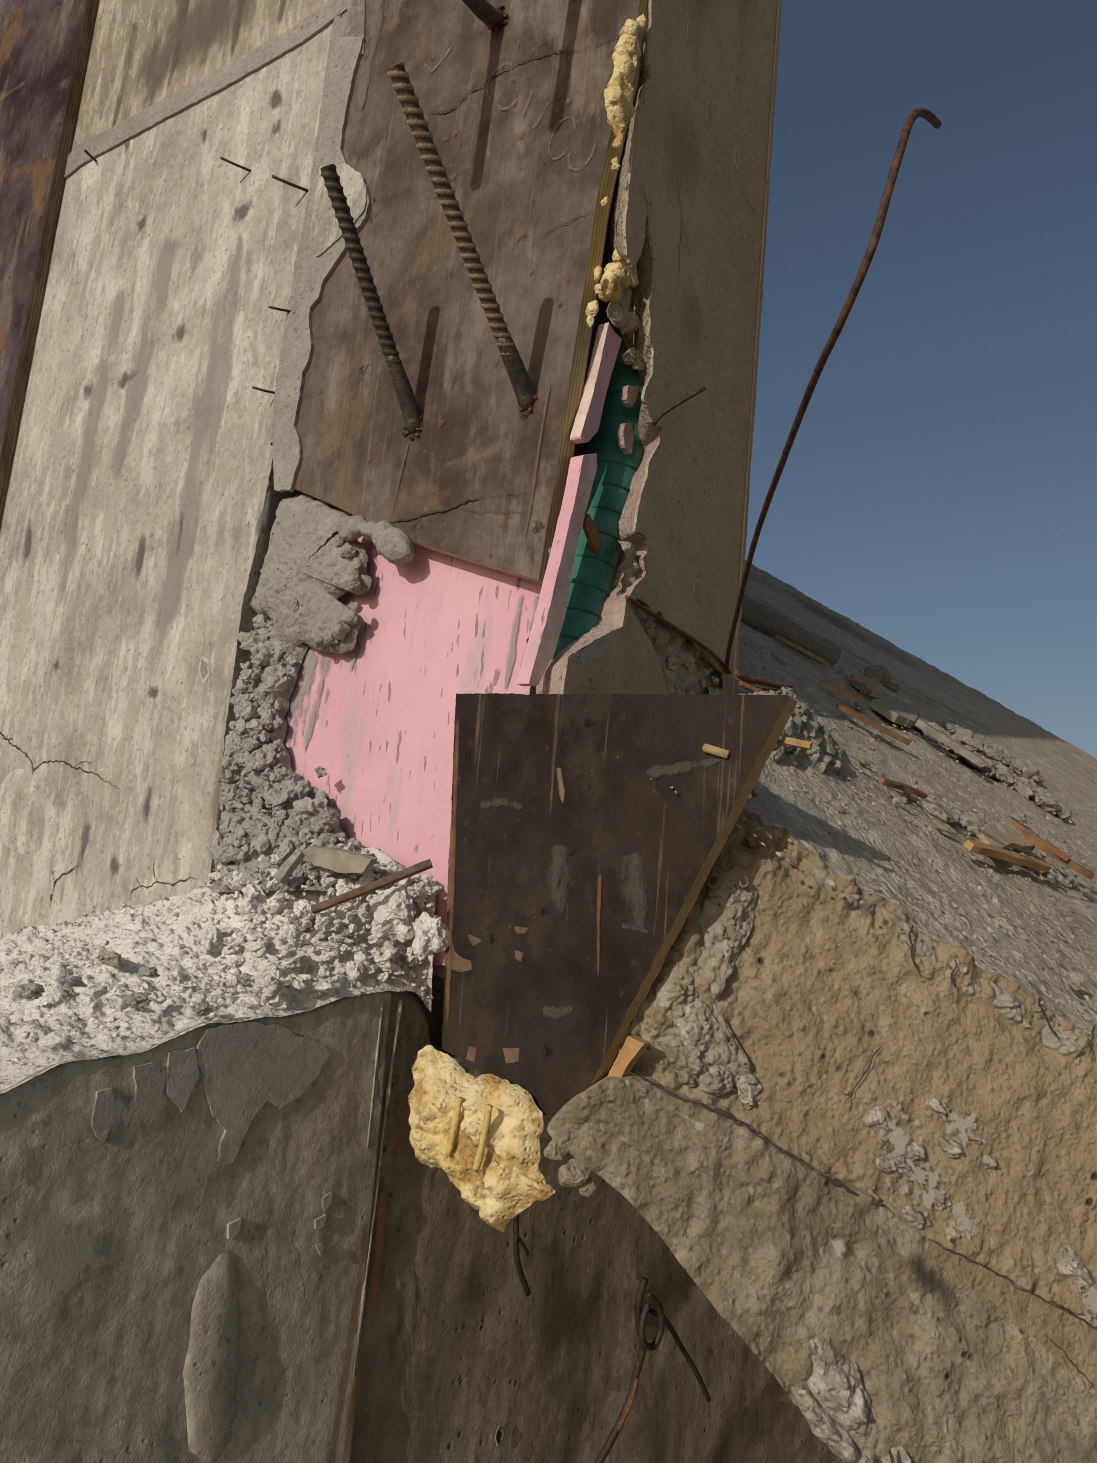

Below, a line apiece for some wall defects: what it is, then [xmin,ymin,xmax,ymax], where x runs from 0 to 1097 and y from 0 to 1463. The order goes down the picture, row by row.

peeling [250,36,372,654]
crack [0,732,116,787]
crack [628,1070,887,1207]
crack [843,1047,881,1106]
spalling [863,1097,1001,1240]
crack [933,1241,1097,1390]
spalling [1055,1245,1097,1327]
spalling [787,1338,913,1463]